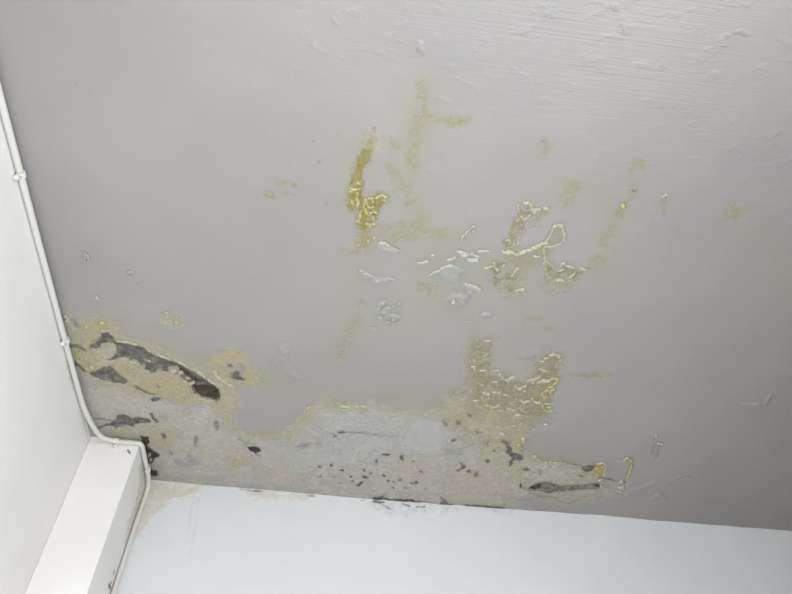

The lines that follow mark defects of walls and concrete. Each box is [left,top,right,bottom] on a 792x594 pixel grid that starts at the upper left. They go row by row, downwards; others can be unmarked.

peeling [417,250,491,284]
spalling [75,321,245,403]
spalling [93,413,158,428]
water stain [66,319,606,537]
spalling [140,436,159,476]
spalling [500,440,530,471]
spalling [519,463,600,498]